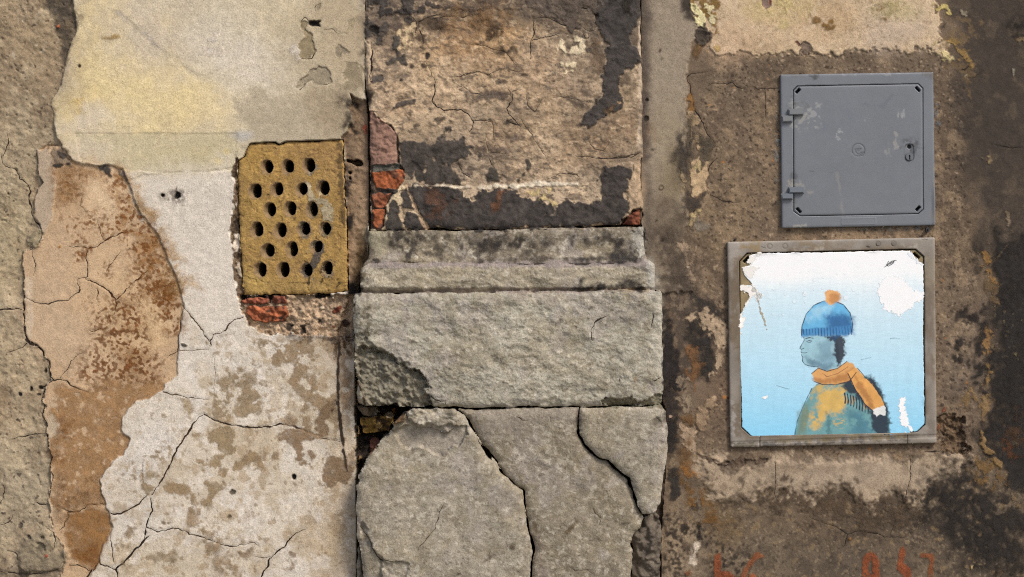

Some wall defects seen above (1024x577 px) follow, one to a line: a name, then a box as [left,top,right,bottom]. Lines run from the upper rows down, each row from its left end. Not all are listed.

peeling [691,0,720,59]
crack [429,7,640,180]
flaking render [99,164,127,181]
flaking render [347,110,589,231]
peeling [620,158,647,258]
crack [0,138,341,577]
flaking render [230,157,446,484]
crack [360,506,443,562]
crack [522,488,535,577]
water stain [668,468,681,501]
water stain [660,514,745,577]
water stain [738,474,927,534]